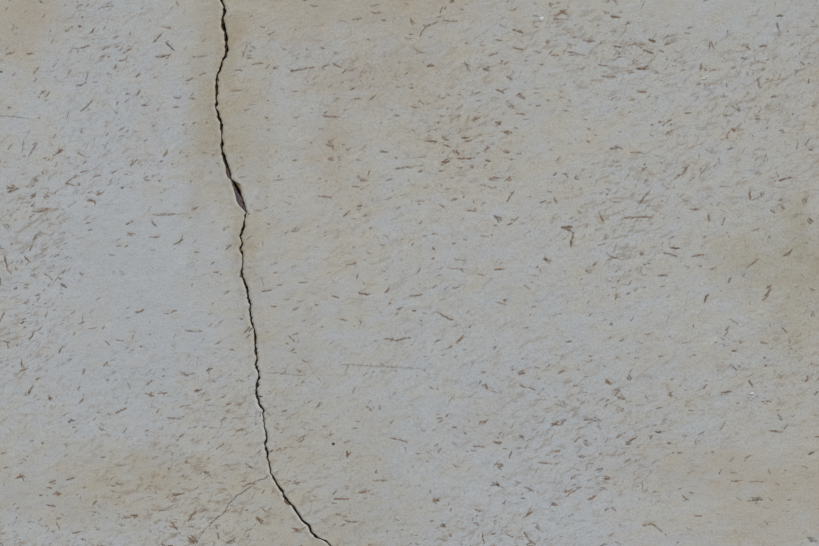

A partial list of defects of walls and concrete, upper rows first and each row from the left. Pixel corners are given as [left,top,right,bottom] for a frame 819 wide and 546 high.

crack [211,0,331,546]